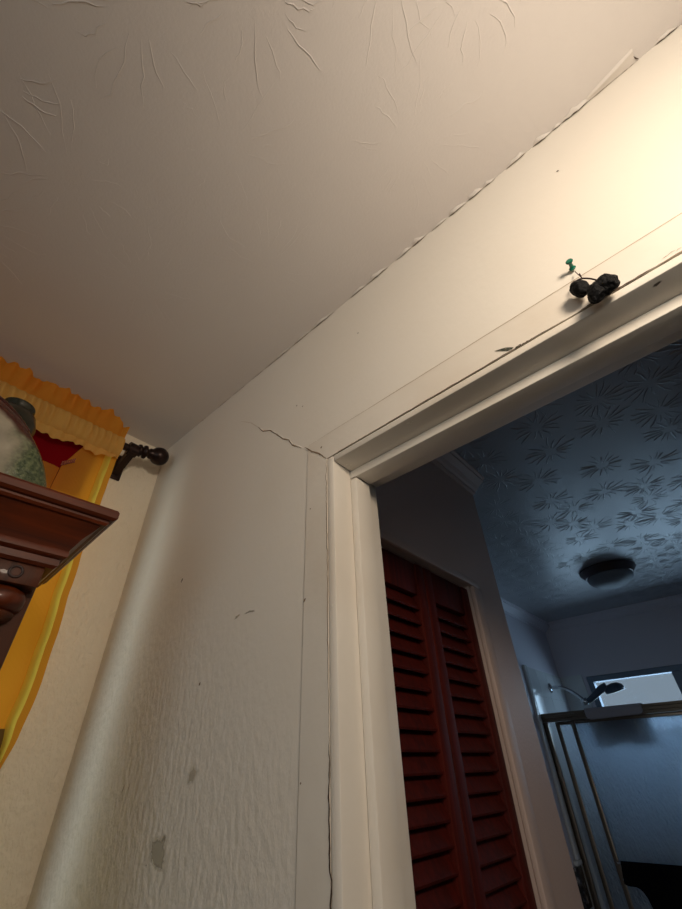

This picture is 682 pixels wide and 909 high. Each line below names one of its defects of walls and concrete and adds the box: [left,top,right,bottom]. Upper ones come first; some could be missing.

crack [241,213,682,645]
crack [326,724,334,909]